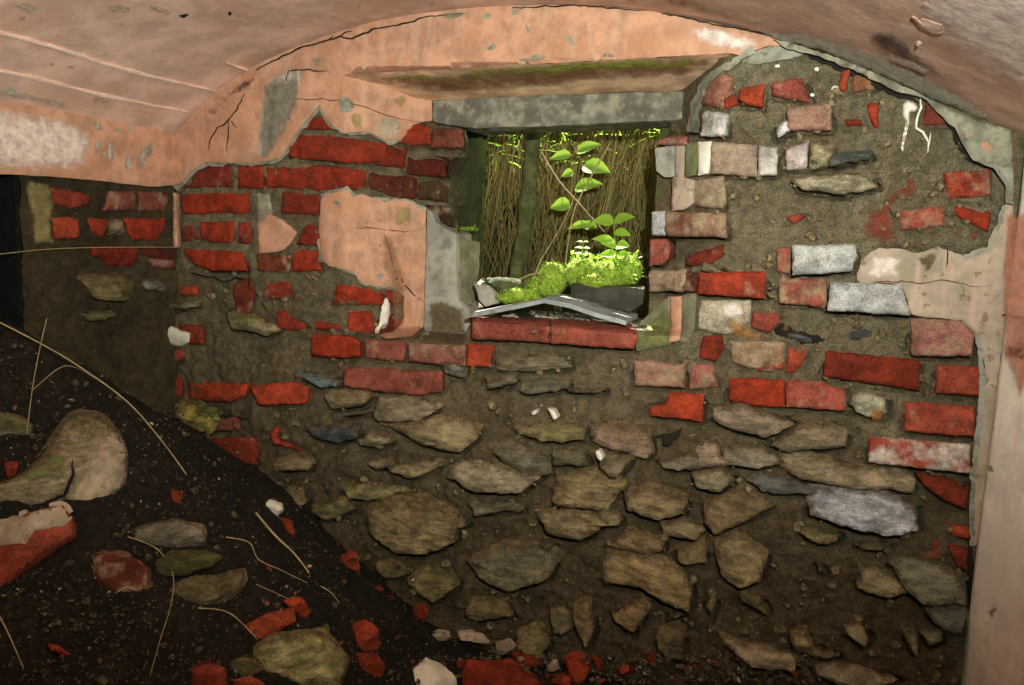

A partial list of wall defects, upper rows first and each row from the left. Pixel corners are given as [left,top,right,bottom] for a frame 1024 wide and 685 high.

damp [0,113,89,168]
flaking render [172,71,469,340]
crack [208,13,465,150]
flaking render [676,46,1008,546]
spalling [652,428,683,447]